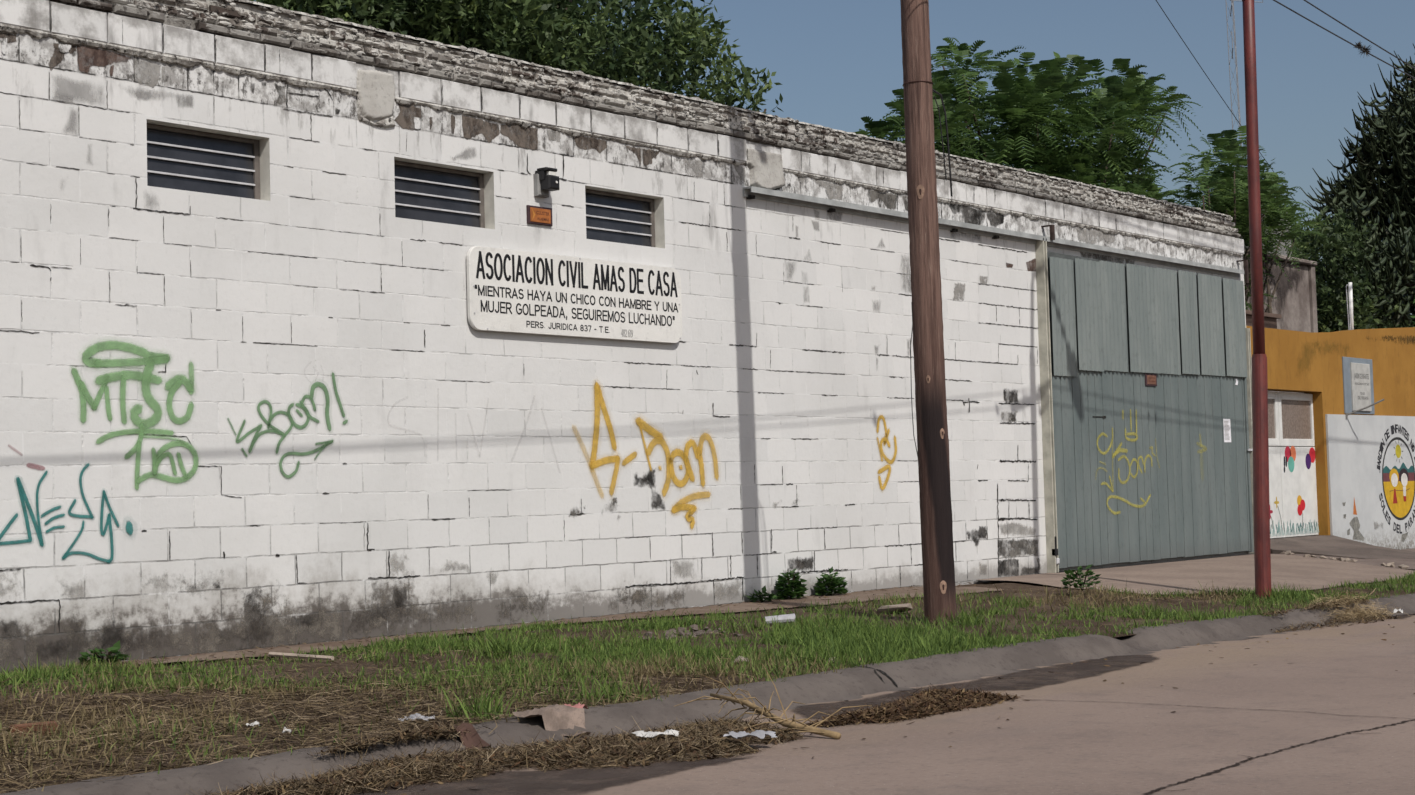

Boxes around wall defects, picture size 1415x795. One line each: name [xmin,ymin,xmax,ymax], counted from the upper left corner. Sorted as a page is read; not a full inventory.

peeling [0,32,16,54]
peeling [49,43,183,88]
peeling [251,82,286,105]
peeling [356,96,433,130]
peeling [451,114,607,153]
peeling [626,146,660,166]
peeling [949,204,1004,227]
leakage [788,557,813,572]
leakage [612,589,683,607]
leakage [0,559,472,667]